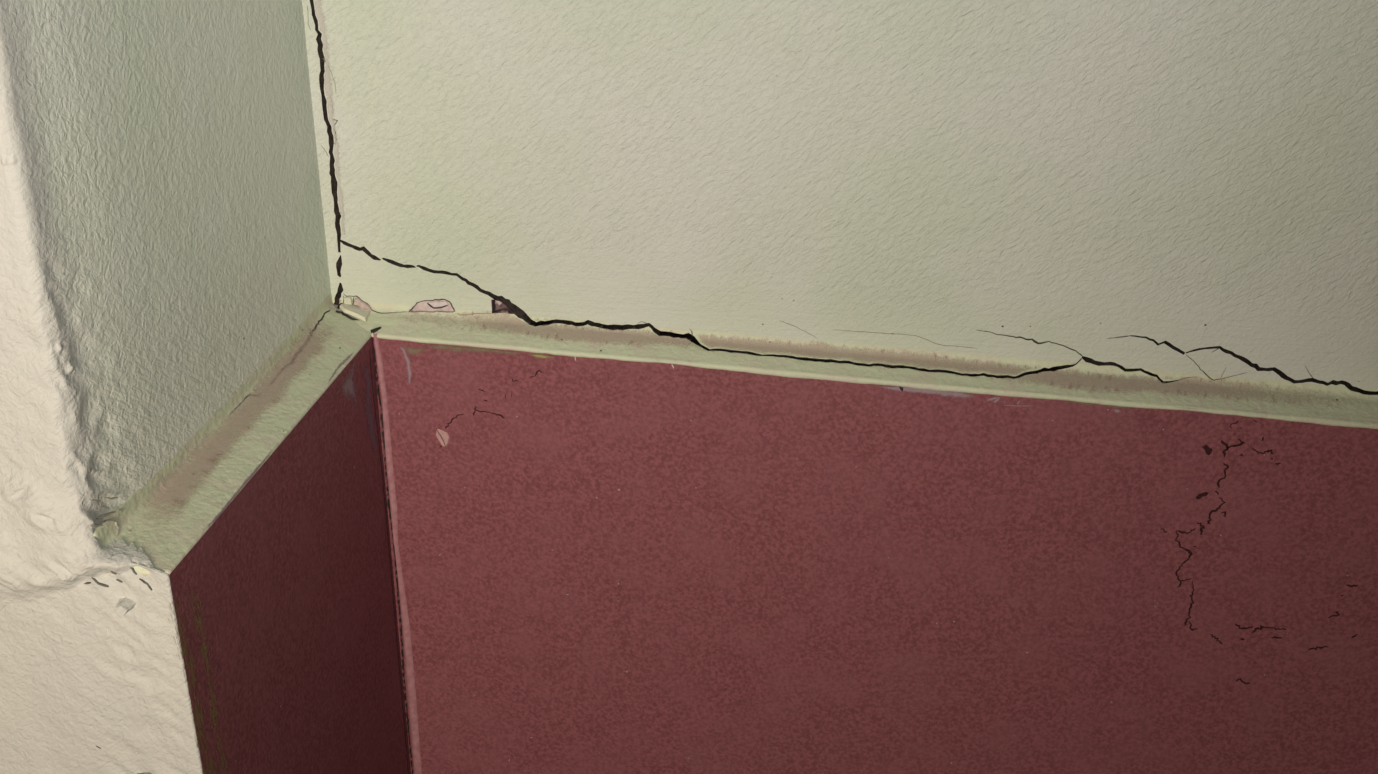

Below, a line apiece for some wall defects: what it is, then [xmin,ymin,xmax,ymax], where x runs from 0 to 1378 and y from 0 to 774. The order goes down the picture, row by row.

flaking render [336,293,519,322]
crack [440,370,542,447]
crack [230,0,1378,415]
crack [369,327,413,774]
crack [1159,420,1358,650]